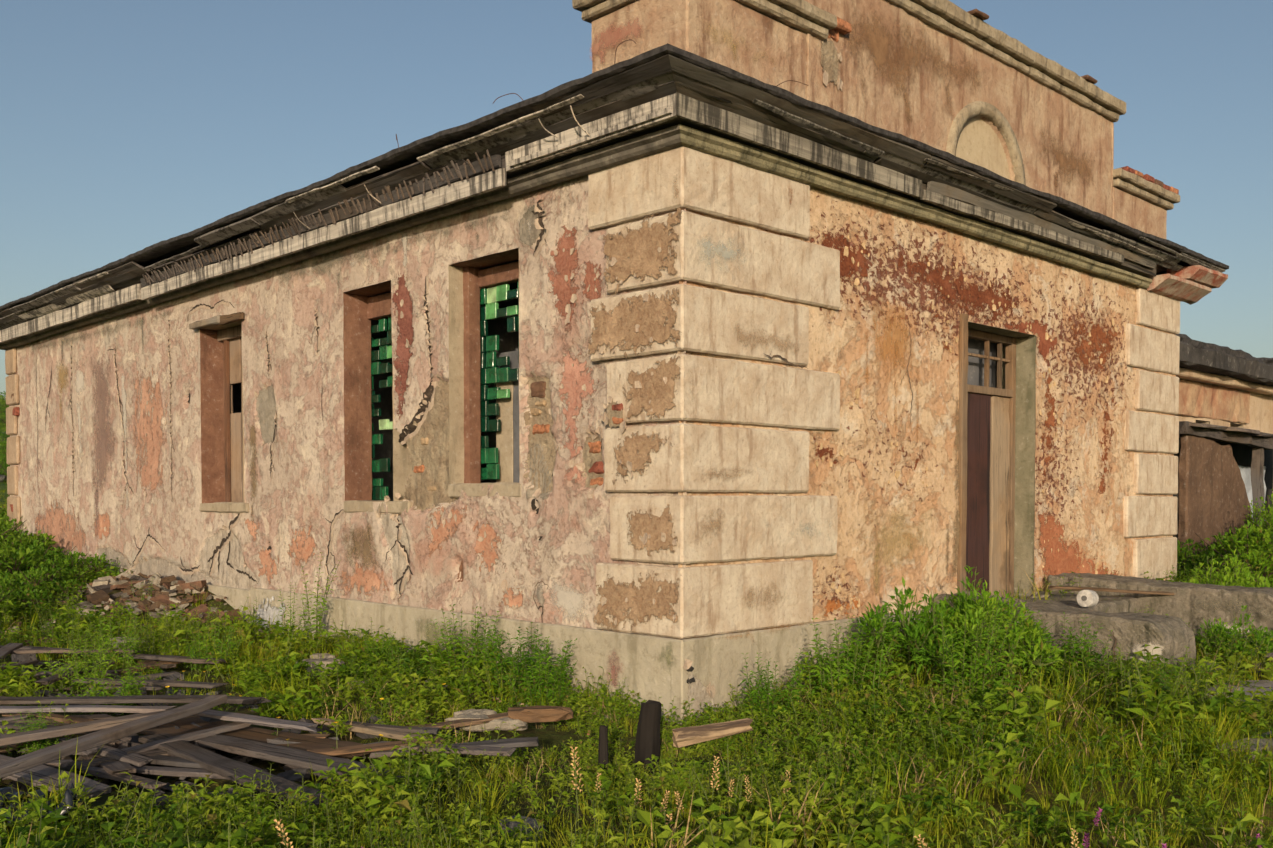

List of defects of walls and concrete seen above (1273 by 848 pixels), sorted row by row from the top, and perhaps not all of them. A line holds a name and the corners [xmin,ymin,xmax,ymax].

peeling [547,225,602,331]
crack [110,339,258,584]
crack [168,300,234,502]
crack [264,331,272,376]
crack [398,276,436,445]
flaking render [384,273,504,574]
flaking render [520,349,626,499]
peeling [814,437,844,467]
peeling [822,227,1121,518]
crack [324,509,344,596]
crack [385,513,413,605]
peeling [1038,513,1125,583]